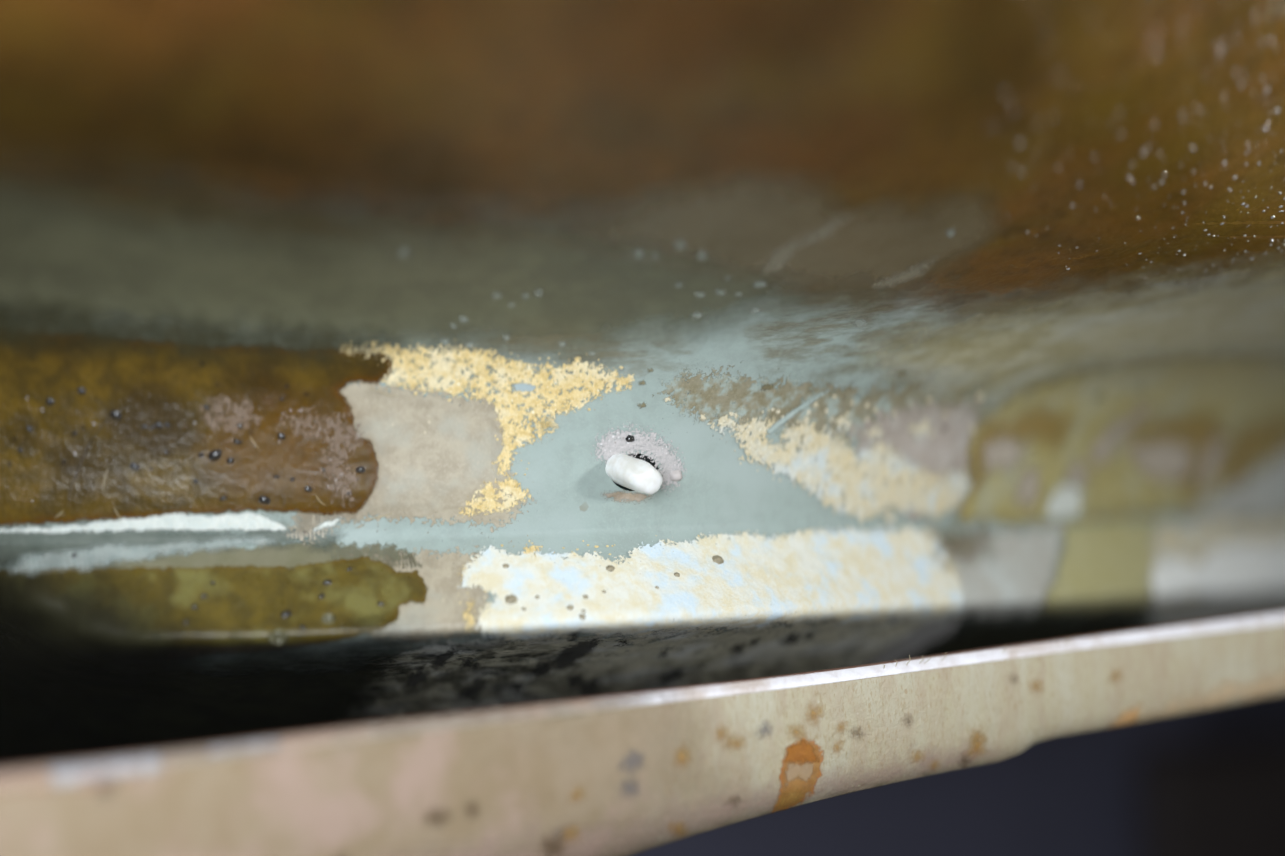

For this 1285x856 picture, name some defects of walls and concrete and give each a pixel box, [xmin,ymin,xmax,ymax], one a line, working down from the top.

peeling [338,341,635,519]
peeling [457,406,1063,664]
water stain [0,553,1155,789]
rust [772,729,838,813]